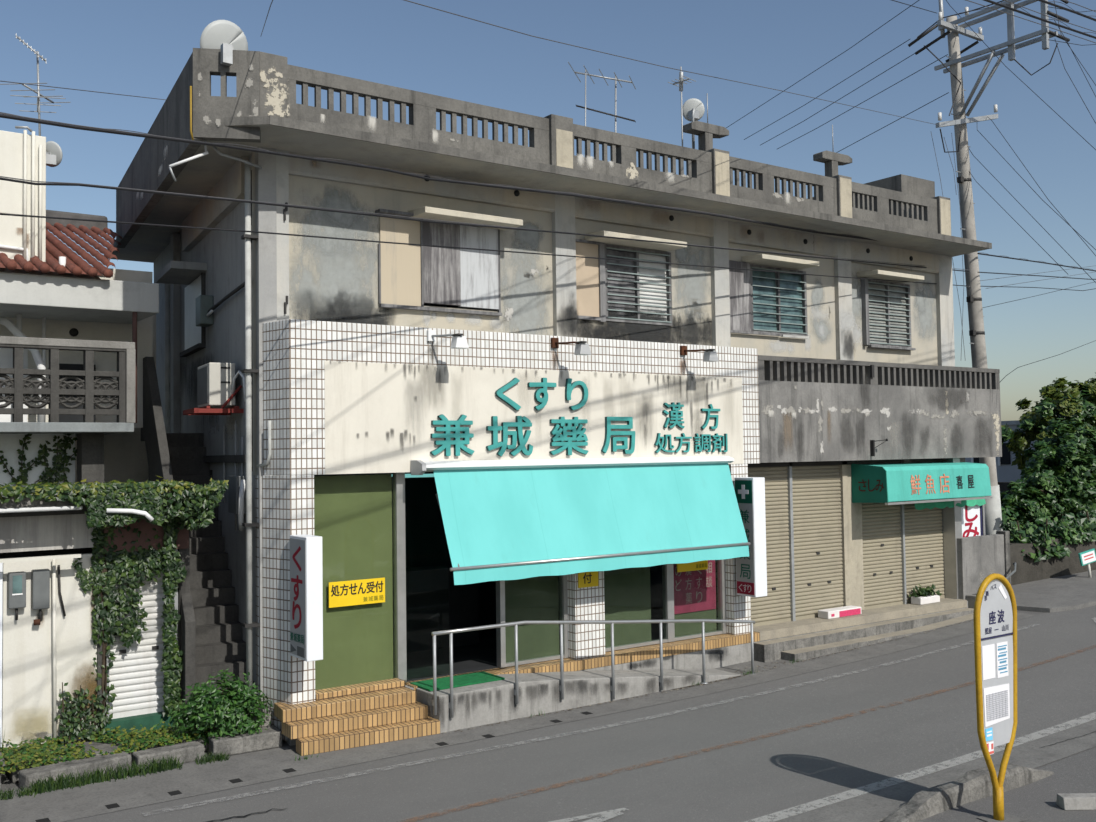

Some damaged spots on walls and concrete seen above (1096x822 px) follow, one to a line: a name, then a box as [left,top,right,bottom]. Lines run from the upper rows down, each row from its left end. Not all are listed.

peeling [236,63,290,117]
leakage [300,294,389,325]
leakage [761,398,891,454]
leakage [911,391,986,456]